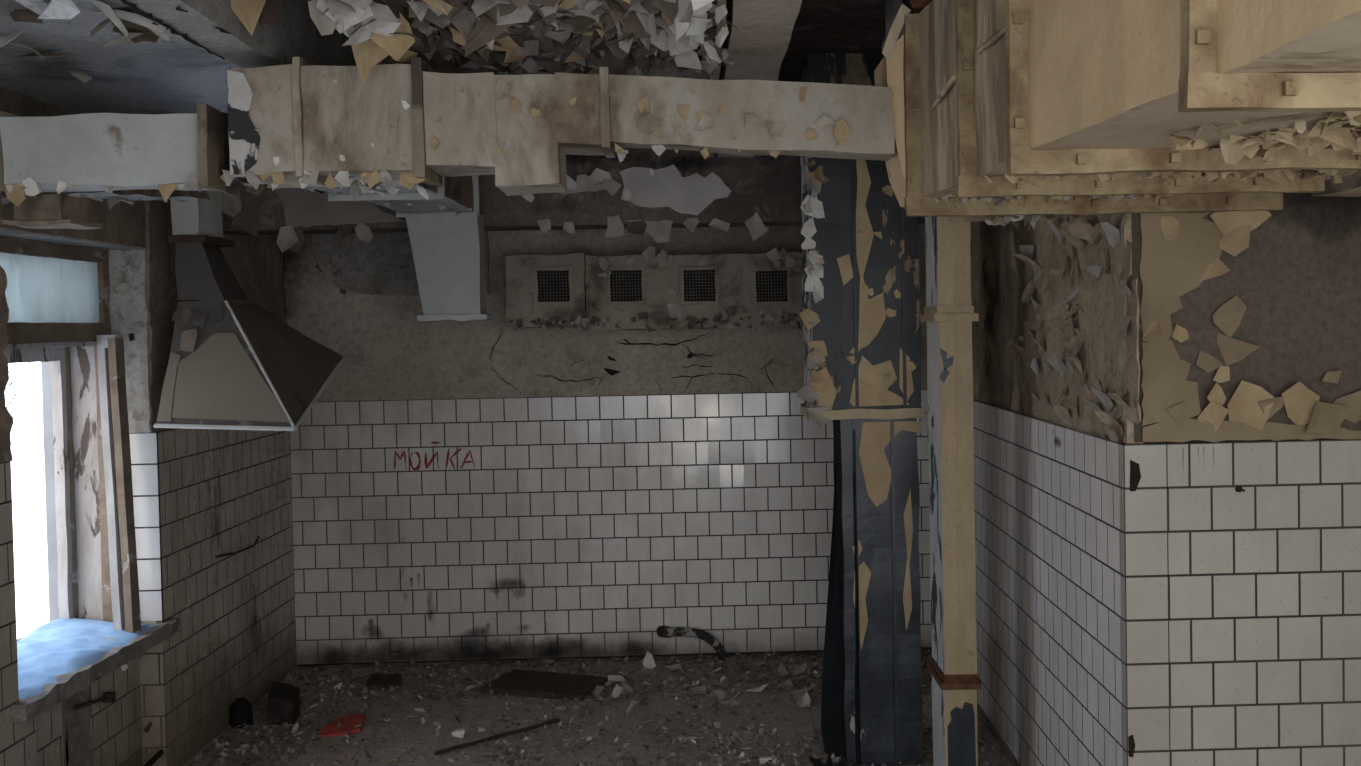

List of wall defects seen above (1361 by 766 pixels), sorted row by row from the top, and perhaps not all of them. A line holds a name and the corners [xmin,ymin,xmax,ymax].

peeling [0,0,171,83]
peeling [308,0,738,85]
peeling [561,96,768,243]
peeling [537,219,575,234]
peeling [797,166,830,403]
peeling [885,289,901,317]
peeling [985,172,1361,442]
peeling [939,348,954,383]
spalling [1130,460,1141,491]